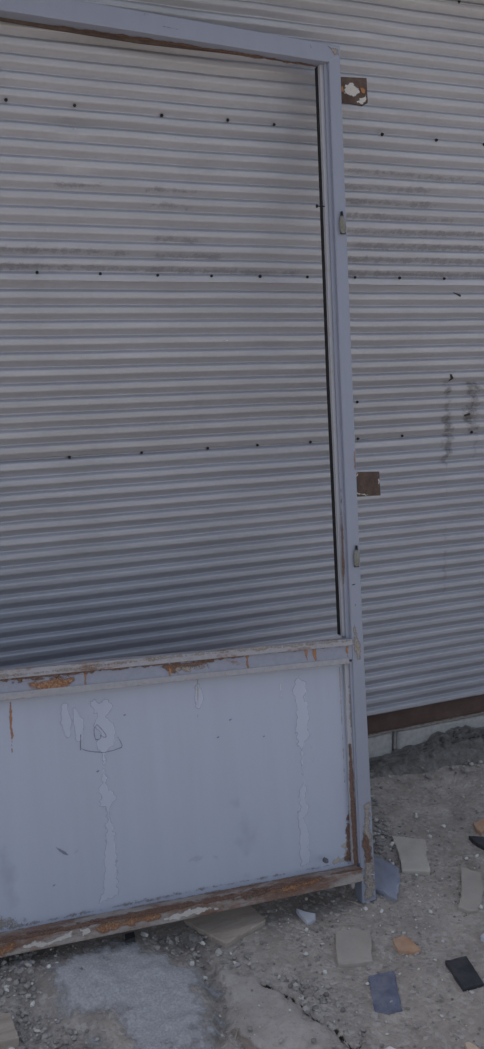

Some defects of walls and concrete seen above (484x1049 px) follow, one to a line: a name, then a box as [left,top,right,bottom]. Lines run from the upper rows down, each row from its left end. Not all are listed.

corrosion [0,655,249,689]
corrosion [333,744,363,874]
corrosion [0,876,323,956]